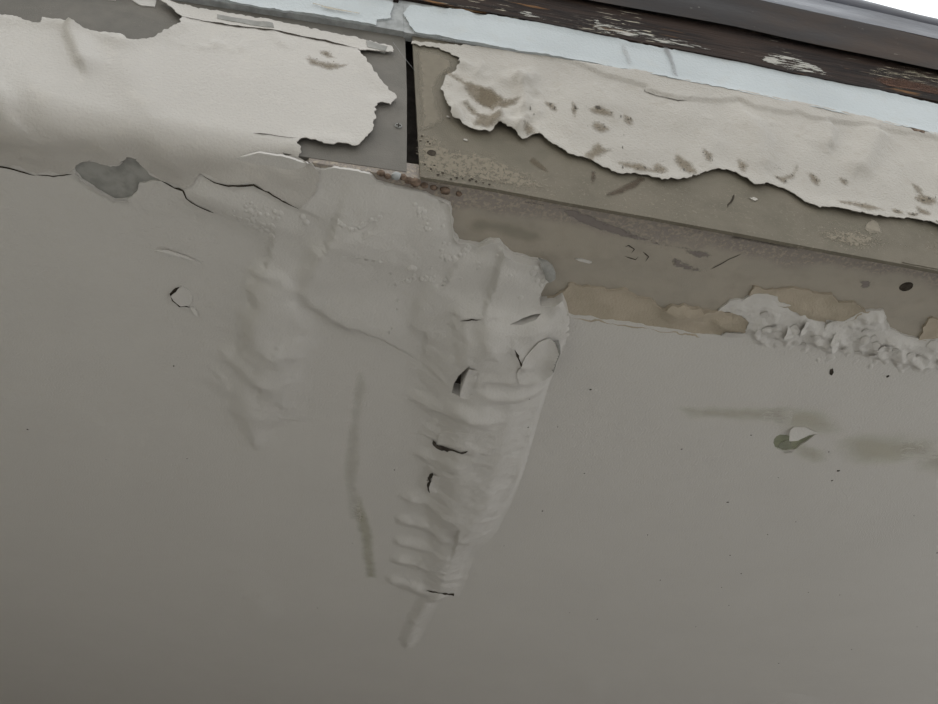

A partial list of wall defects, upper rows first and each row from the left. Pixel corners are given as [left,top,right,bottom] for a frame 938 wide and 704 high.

peeling [0,0,397,208]
peeling [403,5,938,224]
peeling [774,427,818,456]